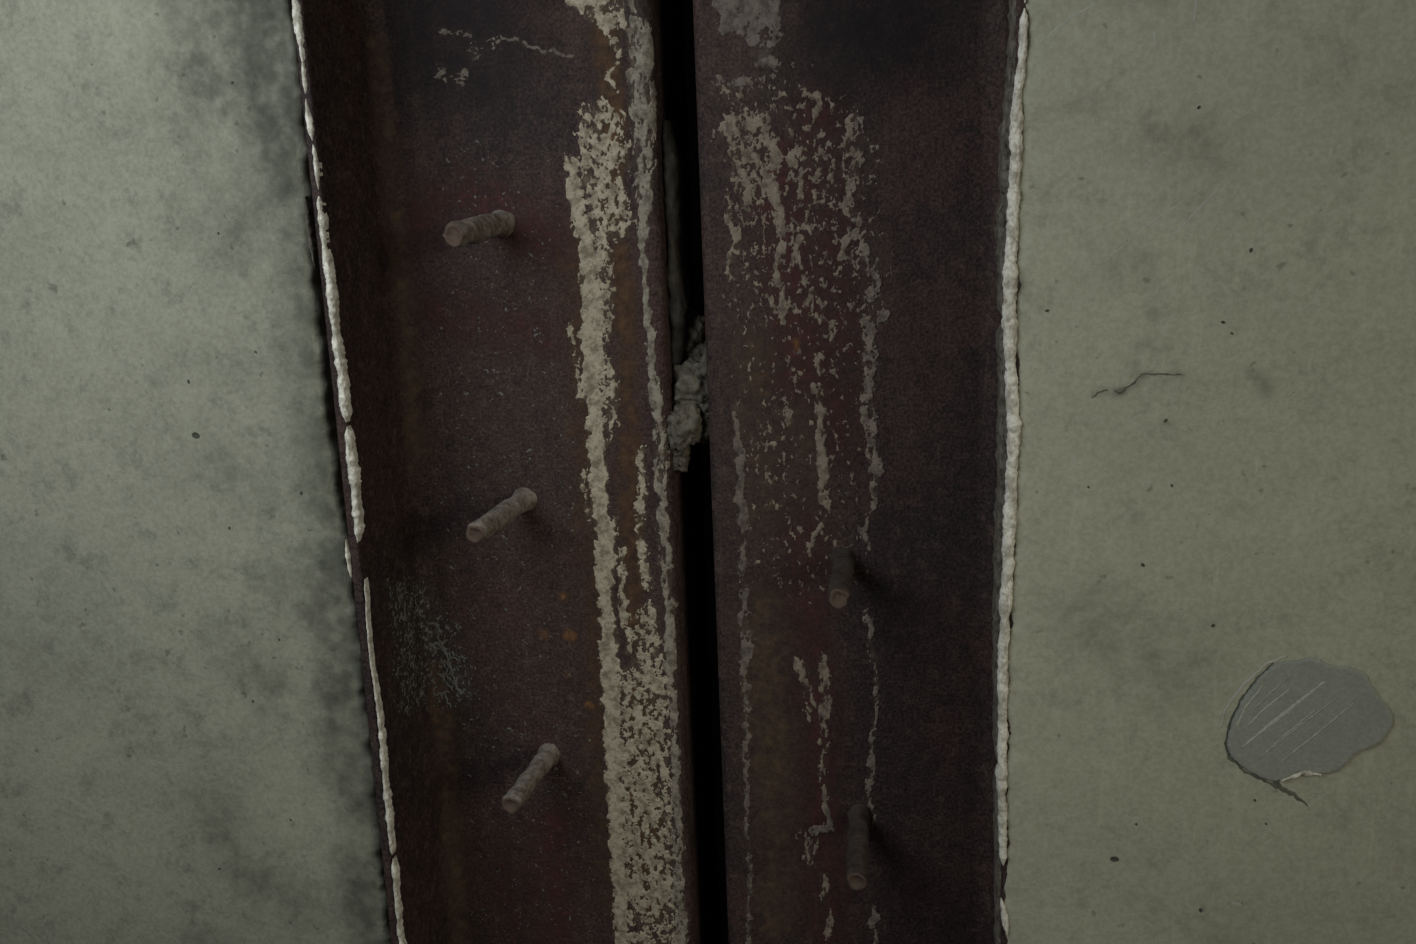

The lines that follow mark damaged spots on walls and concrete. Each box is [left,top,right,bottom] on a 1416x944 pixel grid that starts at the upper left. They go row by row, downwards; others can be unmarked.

rust [596,14,625,221]
rust [758,143,812,388]
rust [629,684,655,765]
peeling [1219,655,1393,782]
rust [627,781,661,918]